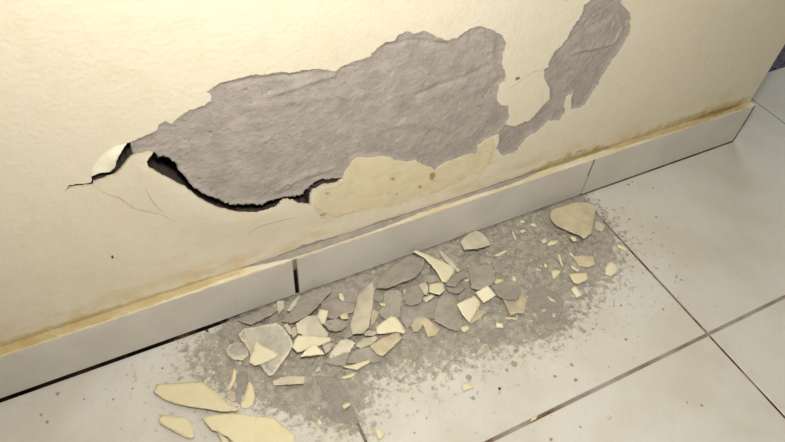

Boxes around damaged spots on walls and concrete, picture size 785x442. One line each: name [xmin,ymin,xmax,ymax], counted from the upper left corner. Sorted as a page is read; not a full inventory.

peeling [91,0,631,205]
crack [92,146,166,217]
peeling [550,202,605,239]